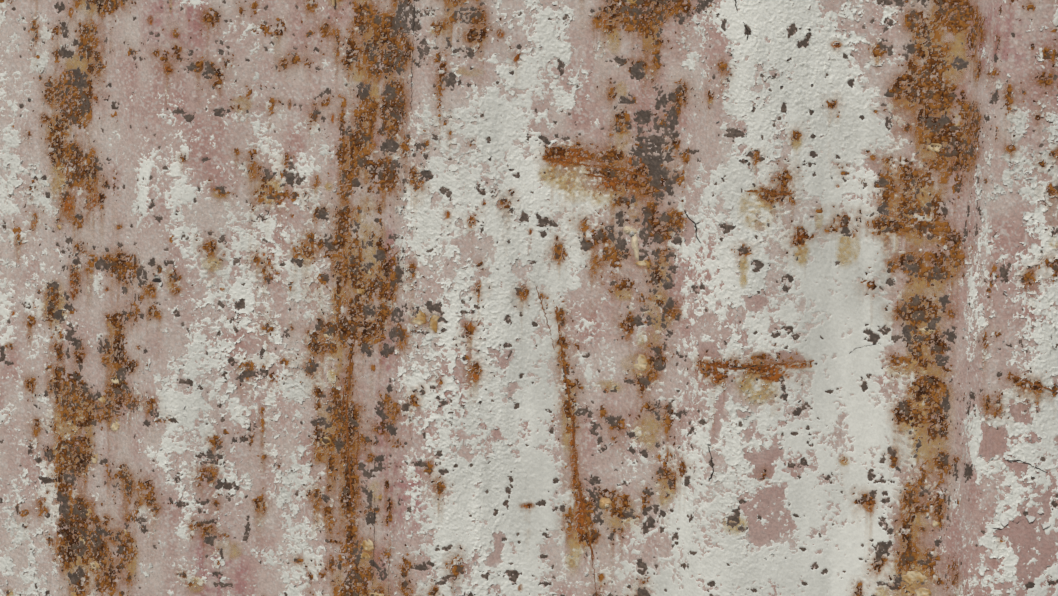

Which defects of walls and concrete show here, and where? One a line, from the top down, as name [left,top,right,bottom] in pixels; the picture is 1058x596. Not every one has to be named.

rust [147,1,234,90]
rust [590,0,720,52]
rust [4,0,190,596]
rust [199,231,227,271]
peeling [410,132,452,201]
peeling [519,211,559,238]
rust [535,109,817,557]
rust [791,0,1058,596]
peeling [148,379,258,588]
peeling [469,531,522,596]
peeling [687,383,813,596]
peeling [968,399,1058,596]